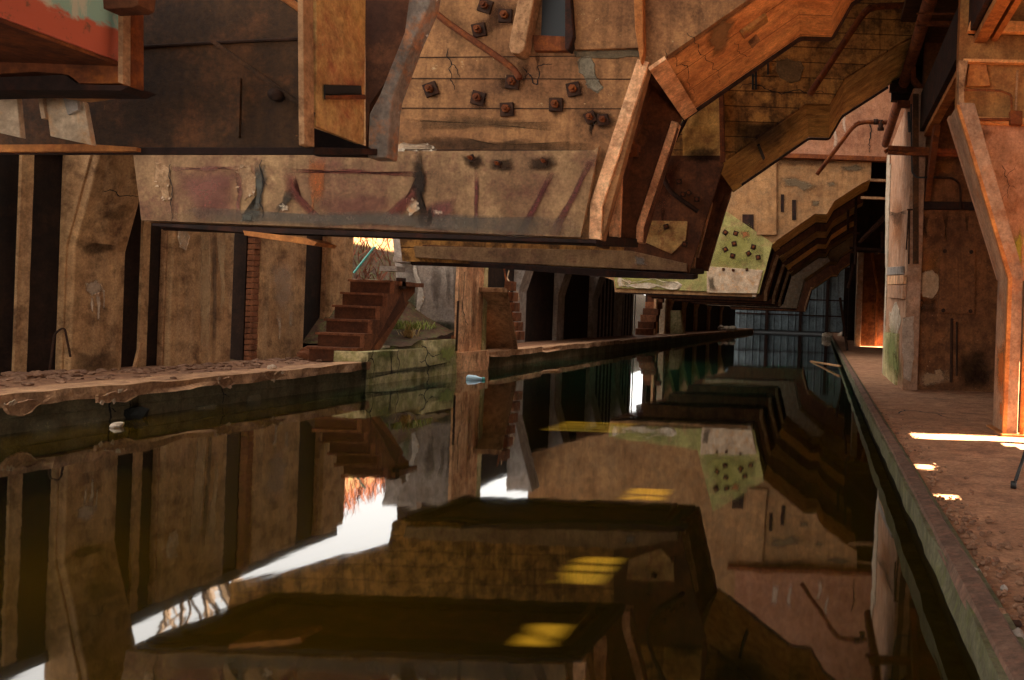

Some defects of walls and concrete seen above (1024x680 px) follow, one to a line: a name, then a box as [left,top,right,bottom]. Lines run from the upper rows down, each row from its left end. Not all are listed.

crack [446,51,460,90]
crack [525,64,551,85]
spalling [577,50,604,93]
crack [665,33,824,95]
rust [526,158,554,220]
rust [554,168,590,226]
spalling [921,270,939,299]